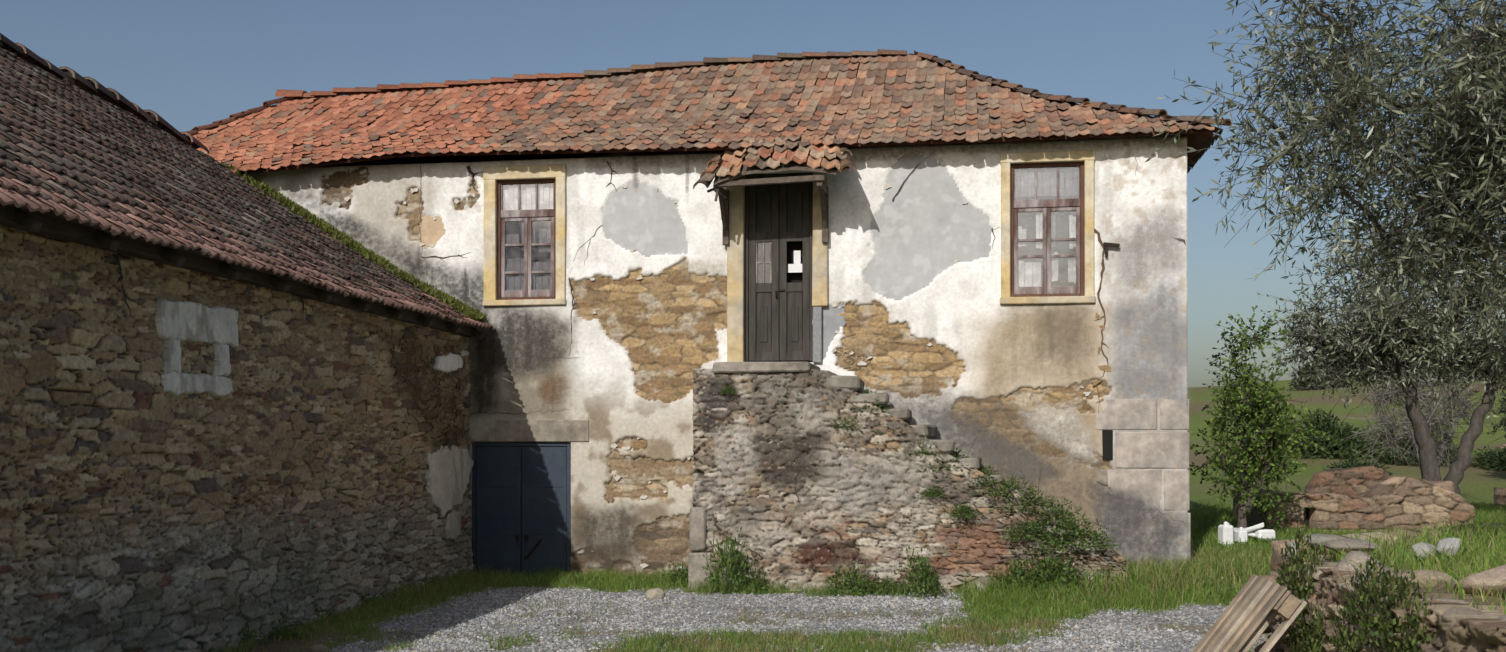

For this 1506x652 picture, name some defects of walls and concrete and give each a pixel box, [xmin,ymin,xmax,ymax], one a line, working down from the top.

spalling [321,166,370,210]
spalling [396,180,480,249]
damp [321,211,567,449]
spalling [569,180,727,403]
peeling [812,153,1112,469]
crack [1092,228,1111,414]
spalling [570,437,694,575]